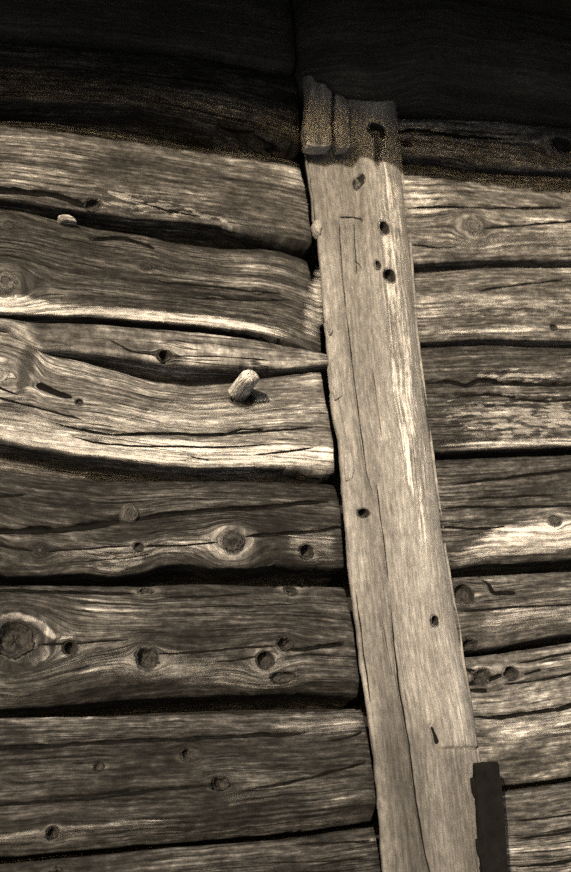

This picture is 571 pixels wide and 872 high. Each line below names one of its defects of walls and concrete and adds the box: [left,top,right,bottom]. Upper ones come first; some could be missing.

crack [426,378,571,402]
crack [0,382,313,461]
crack [519,814,571,839]
crack [519,859,571,867]